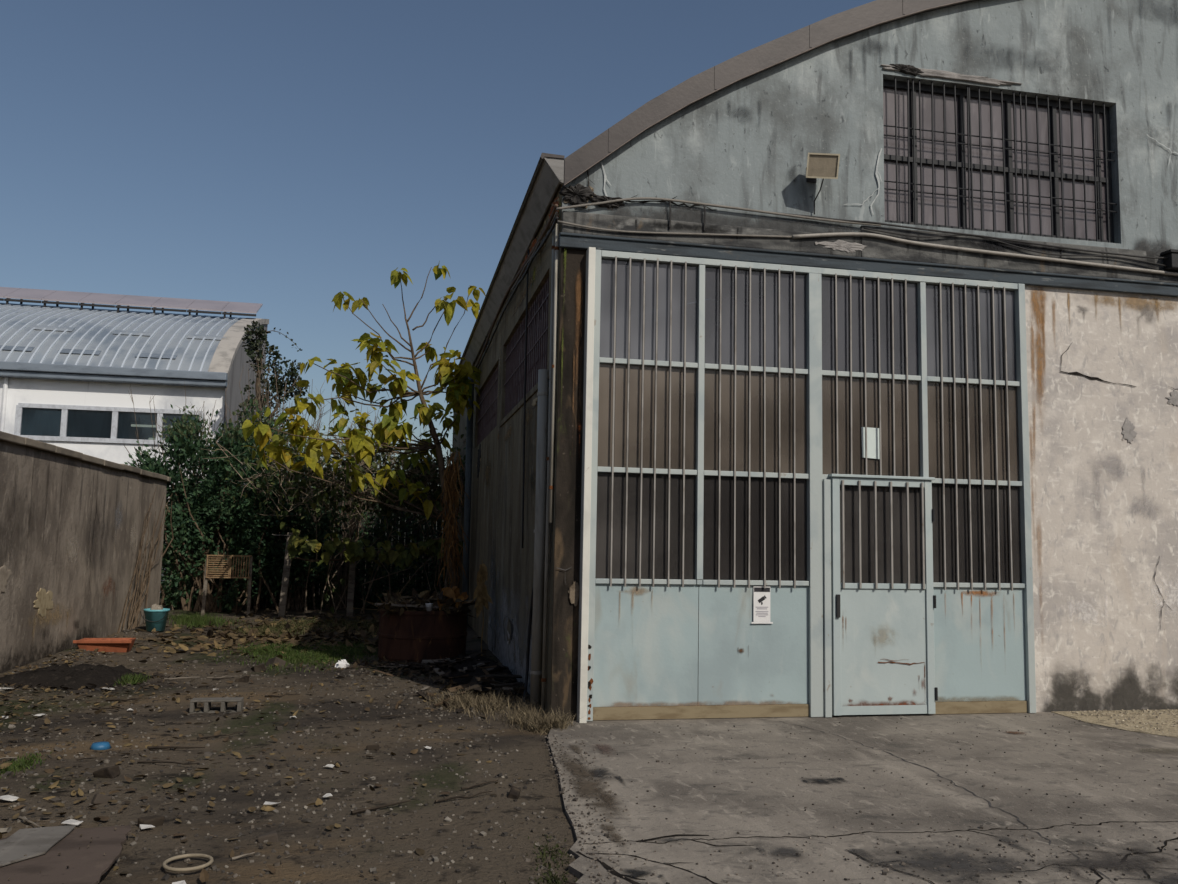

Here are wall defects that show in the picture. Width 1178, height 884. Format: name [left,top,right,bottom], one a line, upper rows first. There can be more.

water stain [610,206,861,237]
water stain [964,240,1065,258]
crack [1060,343,1136,387]
rust [961,591,1005,635]
crack [1154,556,1173,629]
water stain [1044,671,1178,712]
crack [576,721,1178,884]